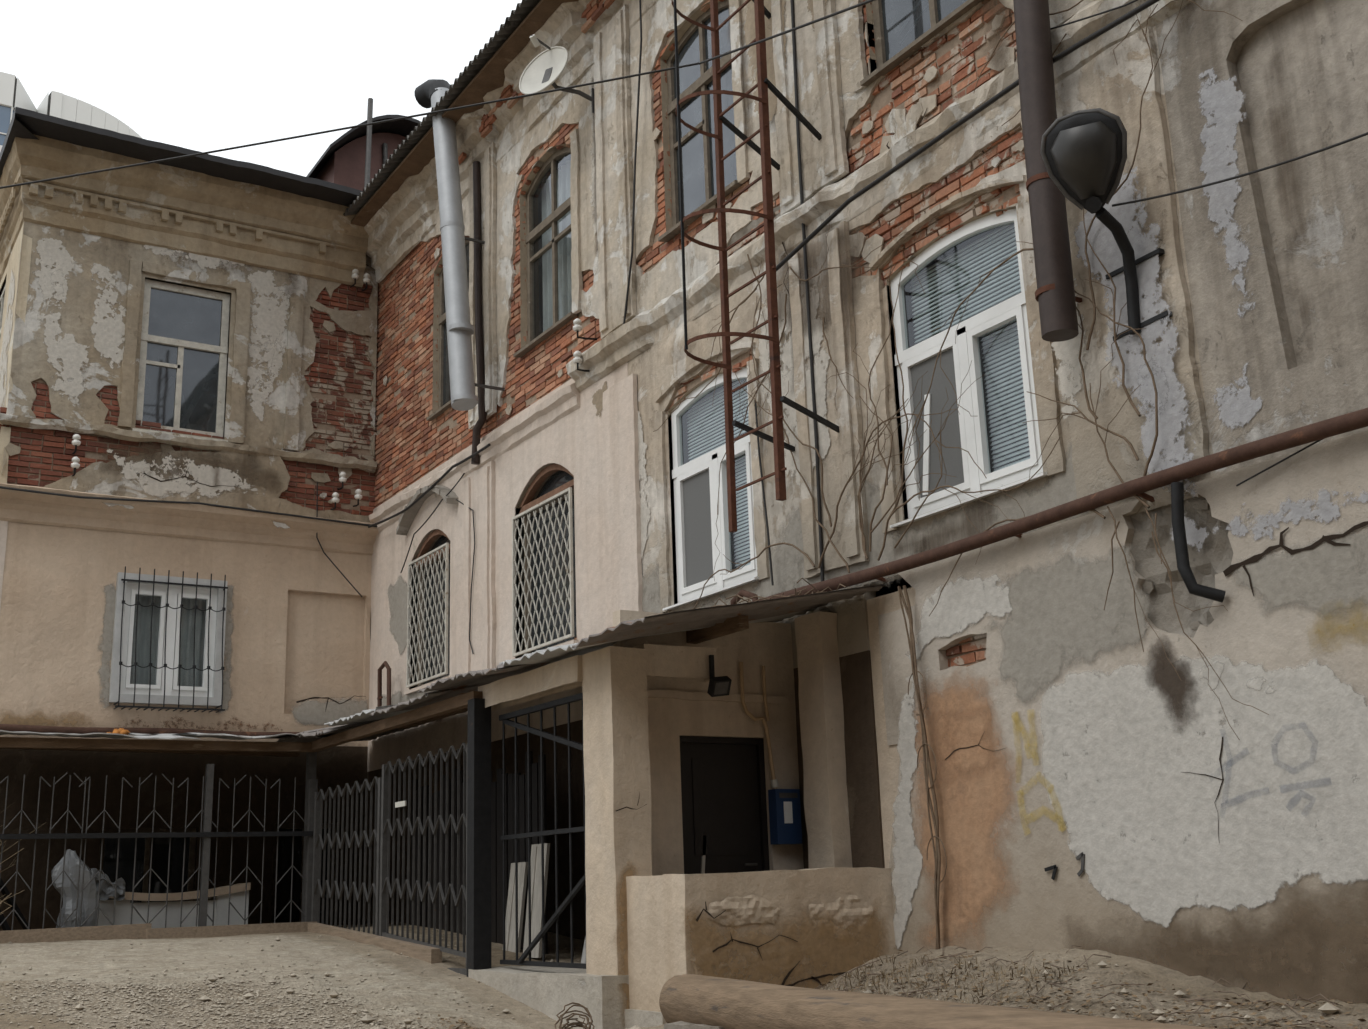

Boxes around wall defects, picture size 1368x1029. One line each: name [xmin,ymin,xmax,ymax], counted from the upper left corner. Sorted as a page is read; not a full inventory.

flaking render [637,30,752,274]
flaking render [744,0,787,121]
flaking render [833,0,1017,184]
flaking render [849,125,1025,287]
peeling [1198,68,1255,317]
flaking render [0,106,602,516]
peeling [1051,166,1368,638]
peeling [907,574,1012,667]
damp [1151,644,1193,721]
crack [1223,521,1368,596]
peeling [1040,654,1368,928]
crack [696,902,846,986]